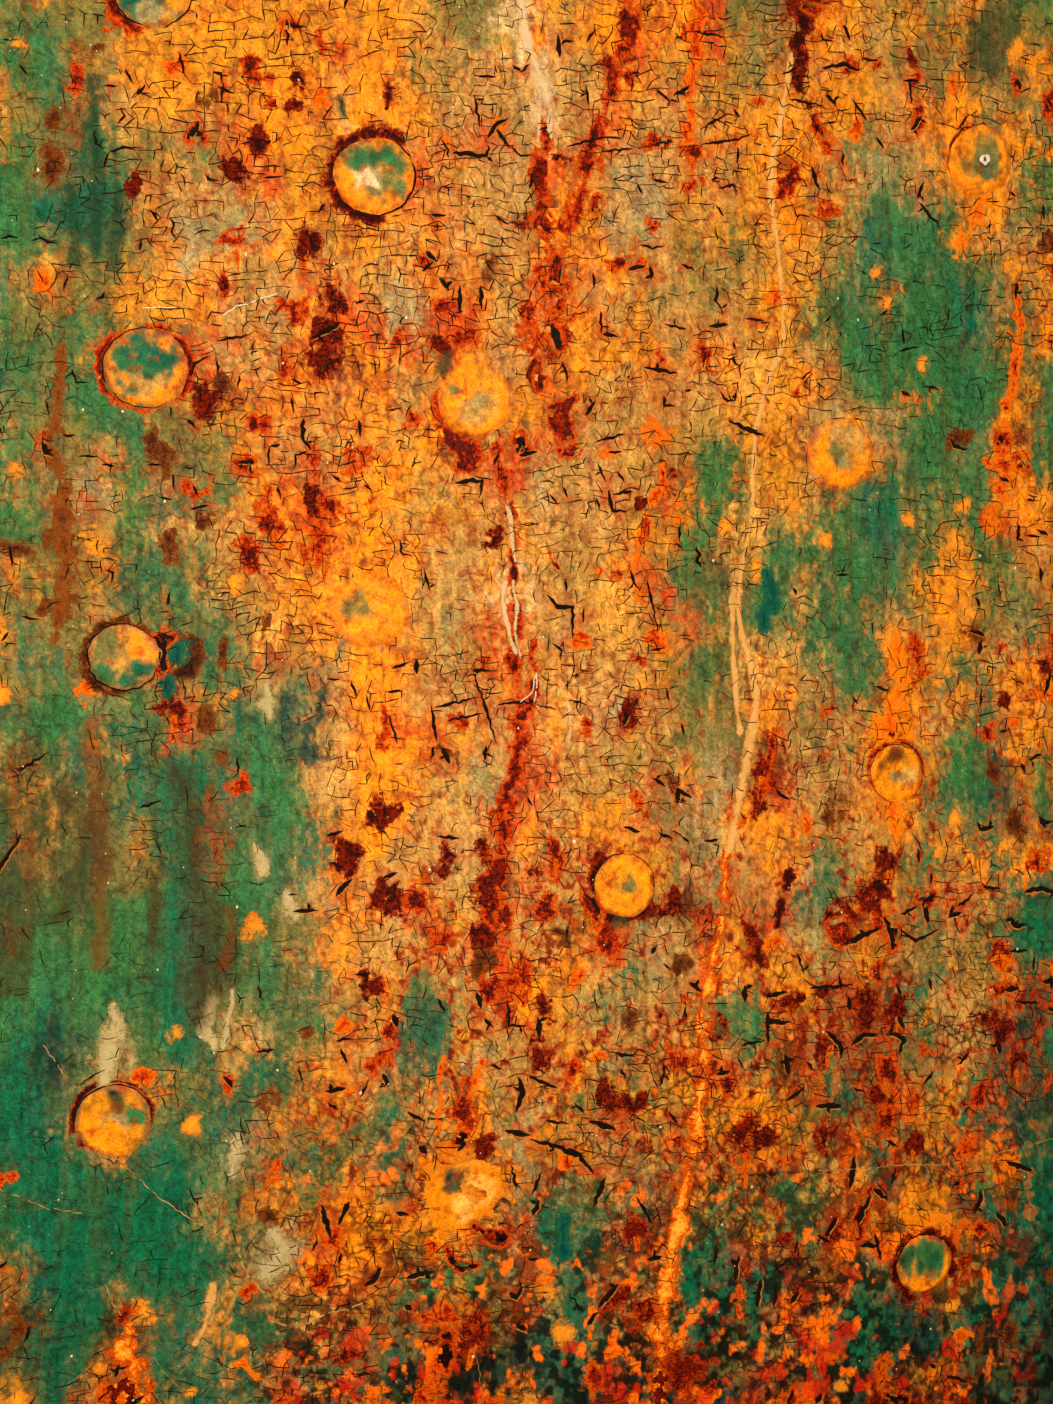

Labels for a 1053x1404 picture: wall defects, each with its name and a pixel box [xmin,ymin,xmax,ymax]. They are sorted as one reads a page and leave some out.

corrosion [512,0,650,396]
crack [628,265,654,279]
corrosion [940,251,1031,655]
crack [0,521,59,620]
crack [64,529,139,588]
corrosion [365,439,650,1118]
corrosion [819,631,972,936]
corrosion [545,845,684,993]
crack [61,1037,202,1136]
corrosion [581,848,799,1404]
crack [569,1283,620,1330]
crack [646,1237,689,1283]